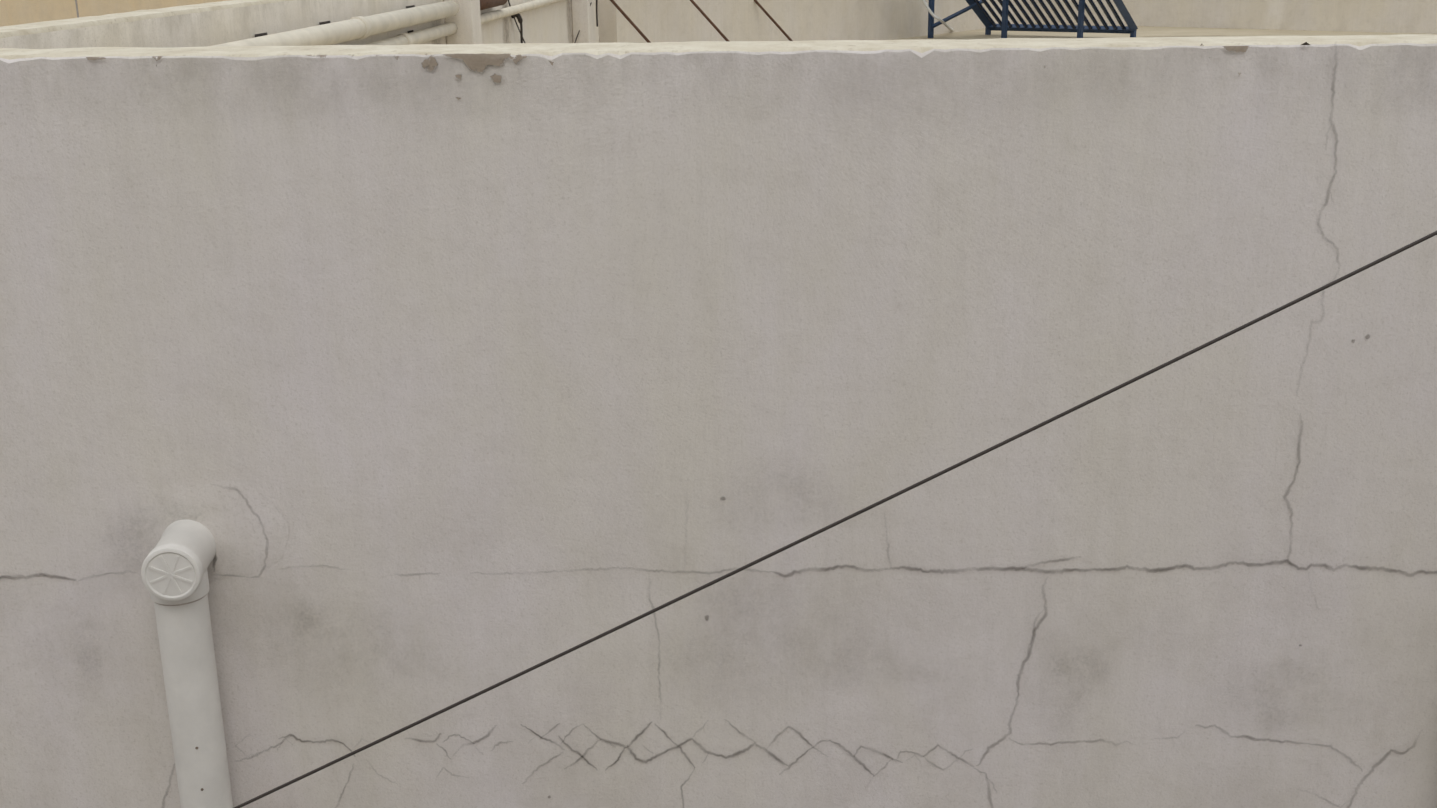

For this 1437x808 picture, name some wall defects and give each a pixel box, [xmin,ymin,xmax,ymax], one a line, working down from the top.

peeling [421,53,527,83]